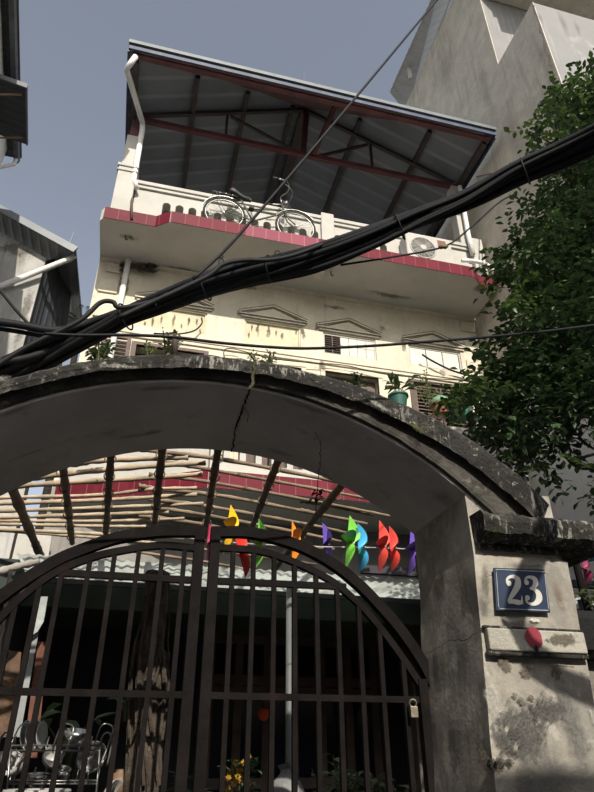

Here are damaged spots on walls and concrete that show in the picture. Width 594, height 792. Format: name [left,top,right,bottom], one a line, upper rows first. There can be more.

water stain [114,260,160,292]
crack [231,361,256,452]
crack [490,650,579,658]
water stain [545,634,575,647]